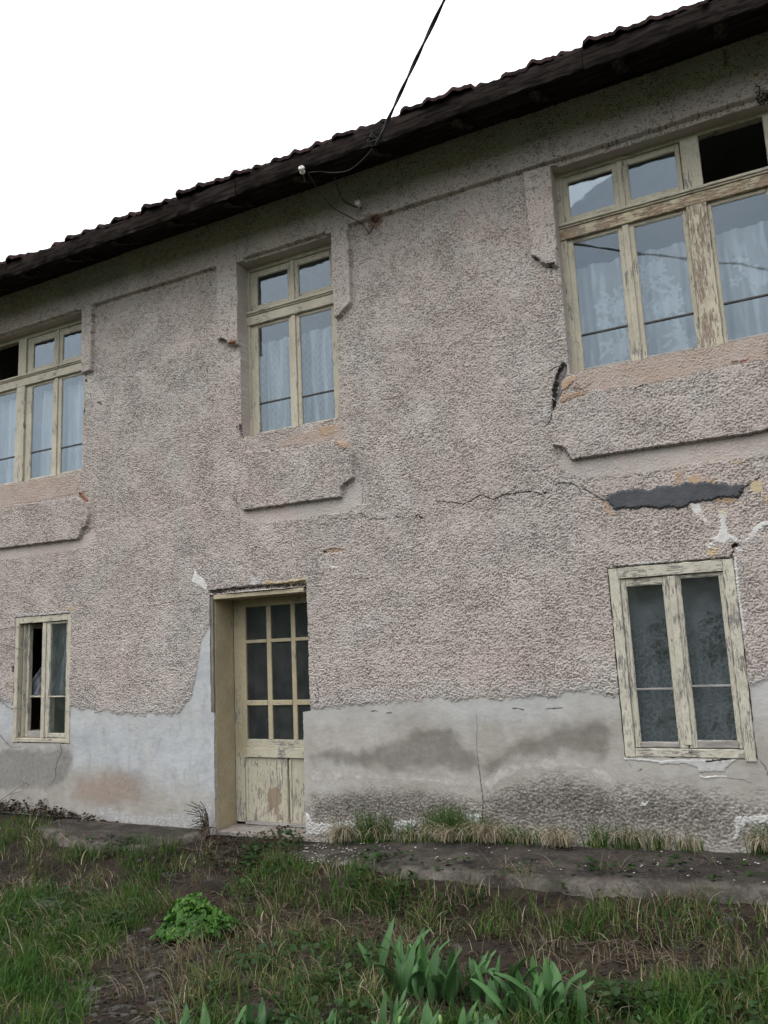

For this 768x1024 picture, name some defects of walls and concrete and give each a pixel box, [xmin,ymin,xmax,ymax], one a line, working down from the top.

peeling [542,335,768,425]
crack [344,482,609,520]
peeling [612,497,768,636]
spalling [191,570,307,594]
peeling [624,757,739,779]
peeling [306,813,356,835]
peeling [394,818,416,833]
peeling [732,814,768,841]